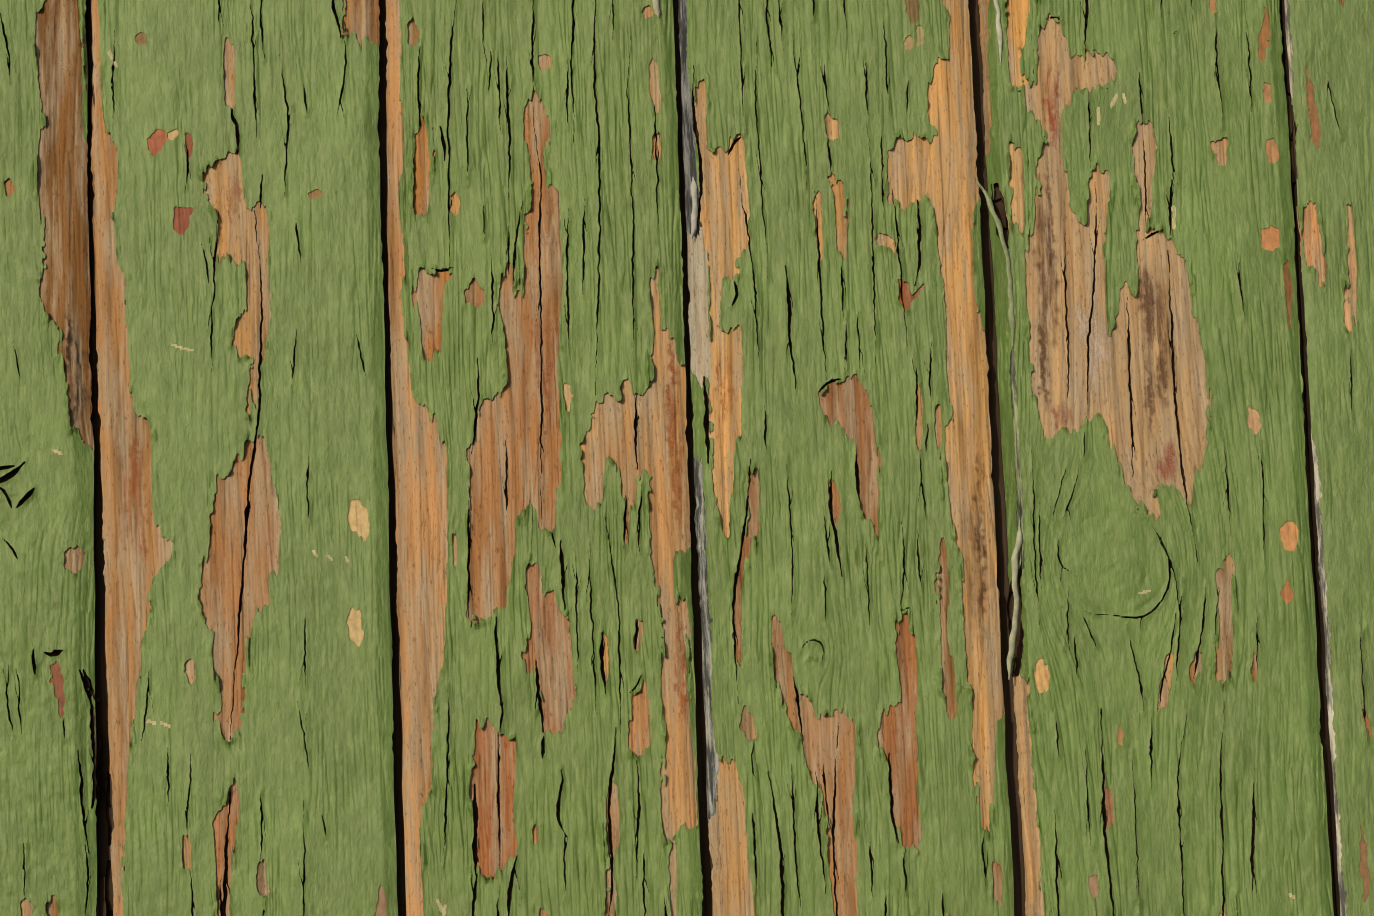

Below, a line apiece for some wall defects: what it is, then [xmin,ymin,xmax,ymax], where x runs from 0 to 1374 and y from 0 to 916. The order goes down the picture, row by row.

peeling [223,38,235,112]
peeling [4,0,178,916]
peeling [147,129,281,751]
peeling [332,0,762,916]
peeling [765,0,1212,916]
peeling [182,835,192,878]
peeling [207,772,247,916]
peeling [256,850,272,904]